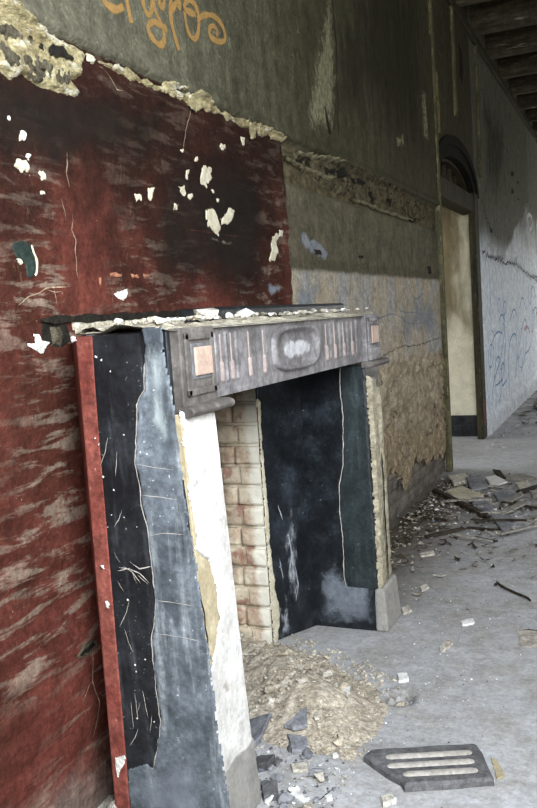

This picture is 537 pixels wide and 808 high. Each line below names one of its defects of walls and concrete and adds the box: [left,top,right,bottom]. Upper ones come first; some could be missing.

flaking render [0,0,431,223]
peeling [194,156,235,237]
peeling [12,241,38,278]
peeling [269,230,283,262]
crack [482,250,537,280]
peeling [115,326,230,808]
peeling [255,744,336,808]